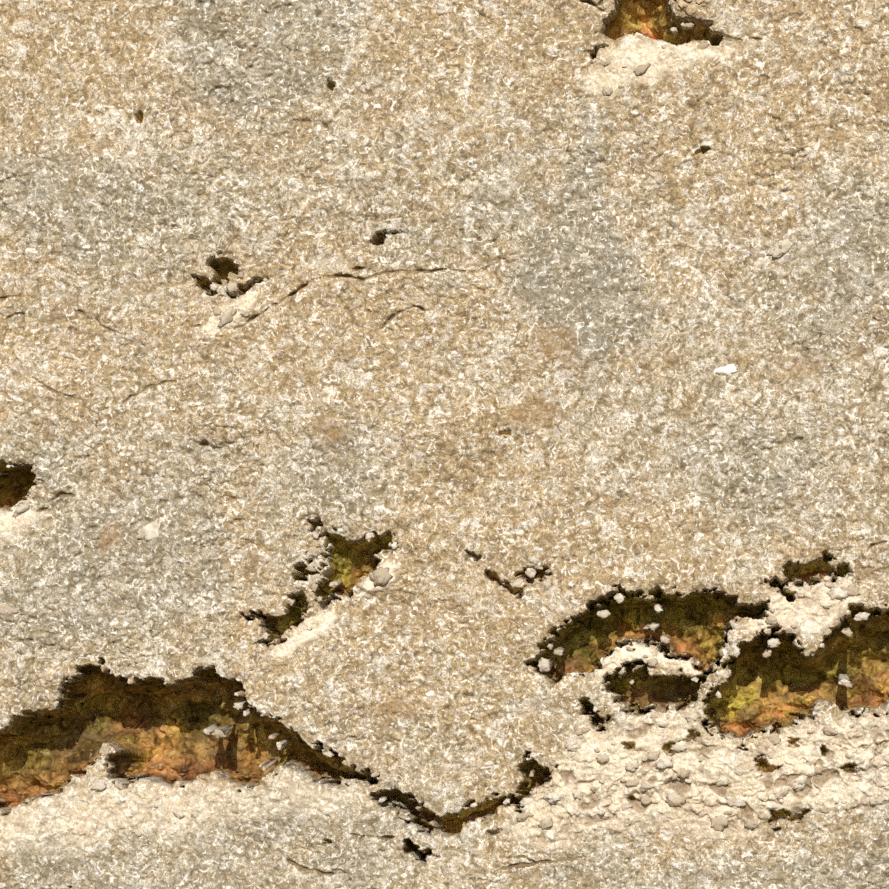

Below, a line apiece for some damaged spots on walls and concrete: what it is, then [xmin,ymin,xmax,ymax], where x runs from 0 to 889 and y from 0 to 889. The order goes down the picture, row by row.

crack [579,0,605,12]
spalling [584,0,766,99]
spalling [193,252,263,335]
crack [234,266,466,330]
spalling [0,460,39,548]
spalling [241,520,400,660]
spalling [485,553,889,852]
spalling [0,659,380,856]